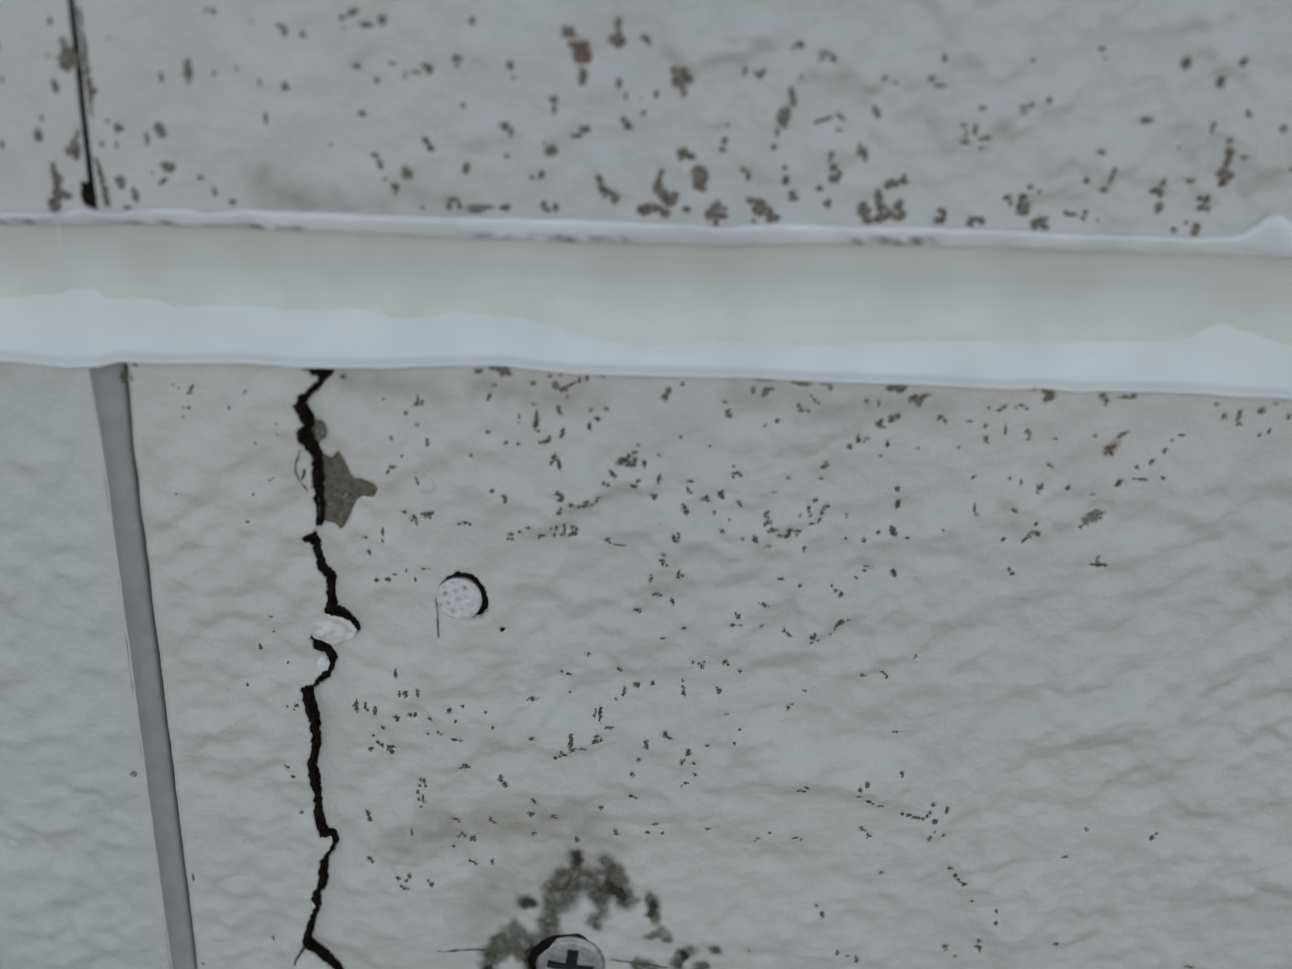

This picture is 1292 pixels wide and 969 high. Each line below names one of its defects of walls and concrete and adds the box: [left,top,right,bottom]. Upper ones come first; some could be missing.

peeling [311,419,403,528]
peeling [402,510,435,526]
crack [293,369,360,969]
leakage [483,851,720,969]